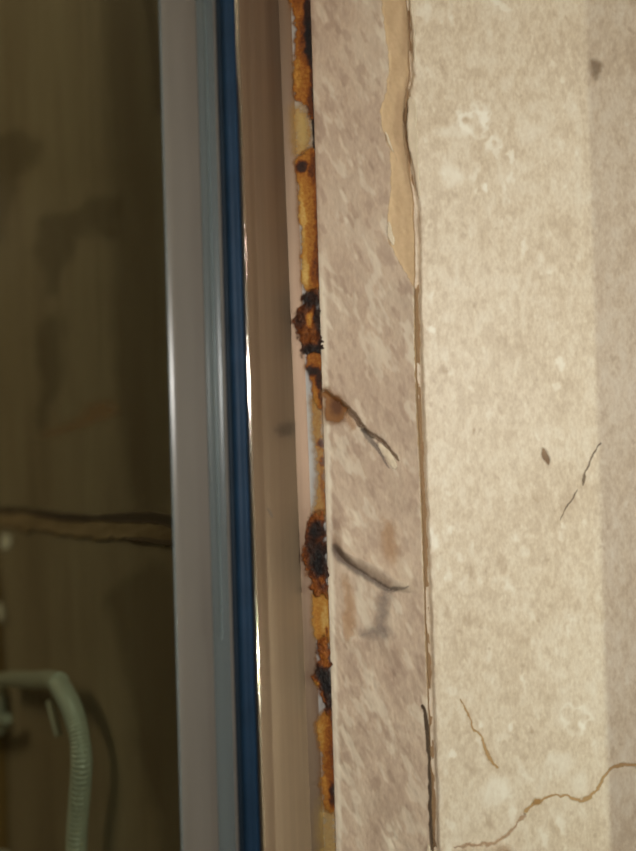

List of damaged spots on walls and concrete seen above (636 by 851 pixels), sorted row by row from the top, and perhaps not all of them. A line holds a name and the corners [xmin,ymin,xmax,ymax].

spalling [380,0,420,290]
rust [288,0,348,851]
crack [324,389,399,469]
crack [560,443,601,520]
crack [333,545,408,591]